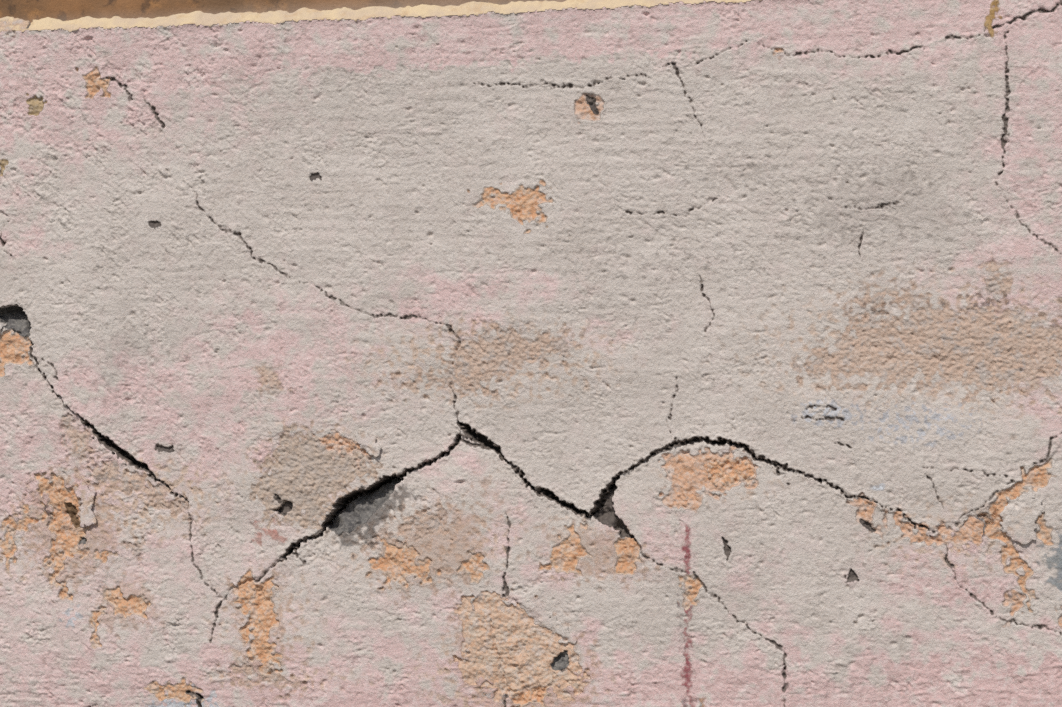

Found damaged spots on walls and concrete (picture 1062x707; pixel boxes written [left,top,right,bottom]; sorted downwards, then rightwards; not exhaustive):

crack [103,77,165,128]
crack [474,41,922,126]
crack [945,1,1062,254]
crack [197,195,461,343]
flaking render [0,417,187,601]
peeling [250,421,382,529]
crack [29,342,1062,643]
flaking render [658,445,759,513]
flaking render [847,458,1056,627]
flaking render [222,570,307,690]
flaking render [445,550,591,707]
crack [693,572,788,707]